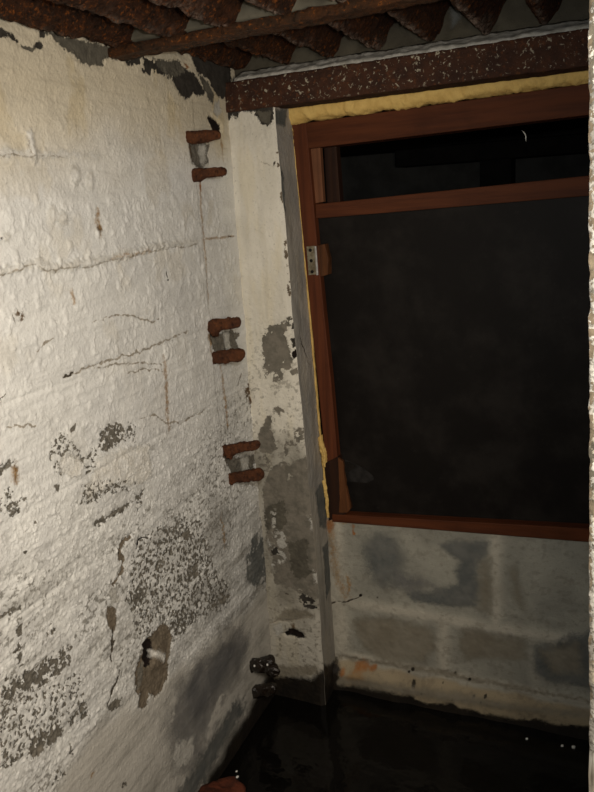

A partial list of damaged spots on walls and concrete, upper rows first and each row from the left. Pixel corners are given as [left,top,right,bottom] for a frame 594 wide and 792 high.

peeling [262,316,298,383]
peeling [223,406,319,609]
water stain [315,483,327,528]
water stain [245,534,266,586]
water stain [322,542,331,599]
water stain [356,527,497,617]
peeling [125,515,231,709]
spalling [273,622,305,638]
water stain [159,606,590,792]